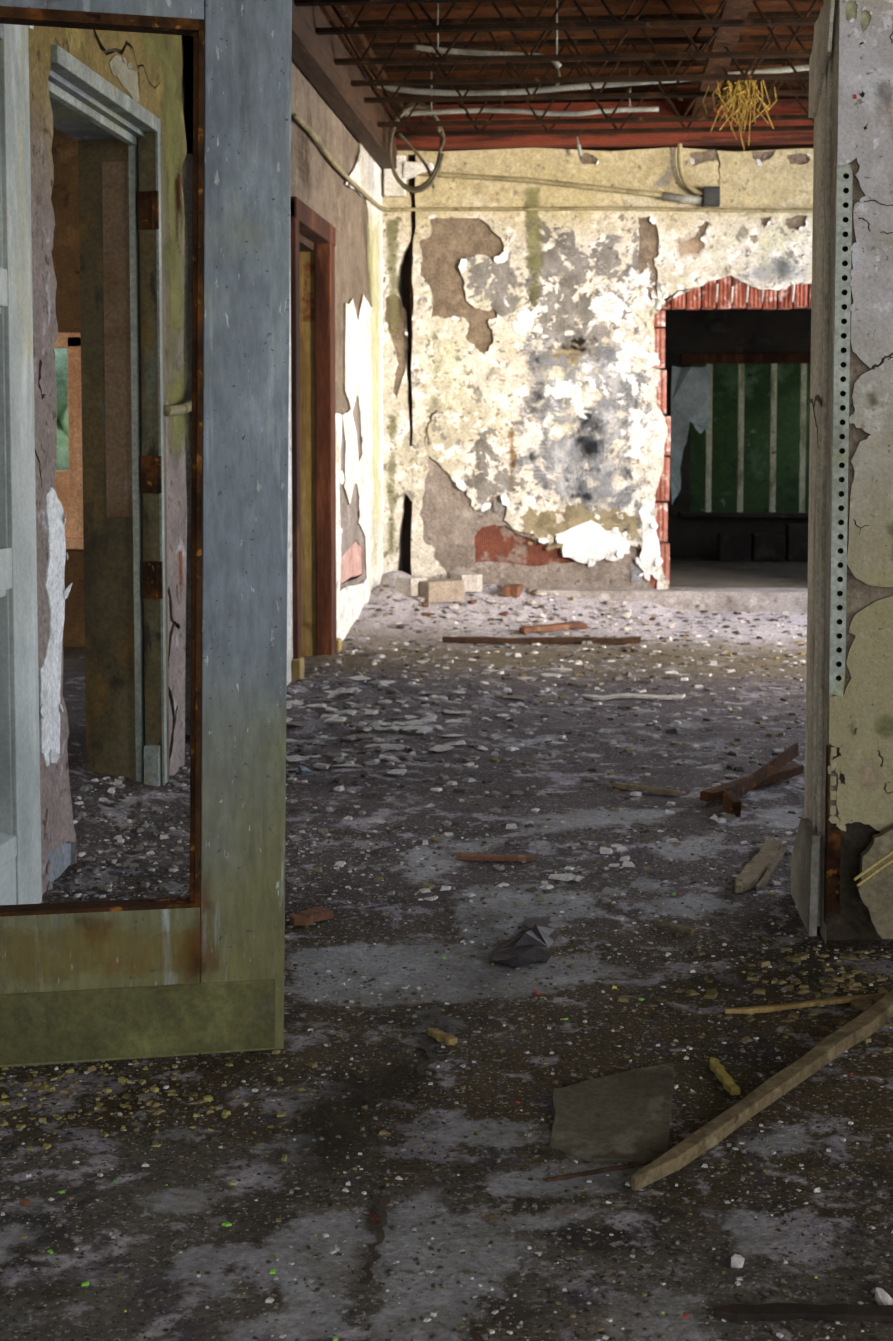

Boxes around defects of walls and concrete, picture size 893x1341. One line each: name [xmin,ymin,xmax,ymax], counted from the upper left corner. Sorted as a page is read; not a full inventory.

peeling [39,487,72,767]
spalling [290,58,408,590]
peeling [418,214,662,467]
spalling [419,427,663,590]
leakage [511,188,652,539]
spalling [831,158,893,697]
spalling [824,744,893,940]